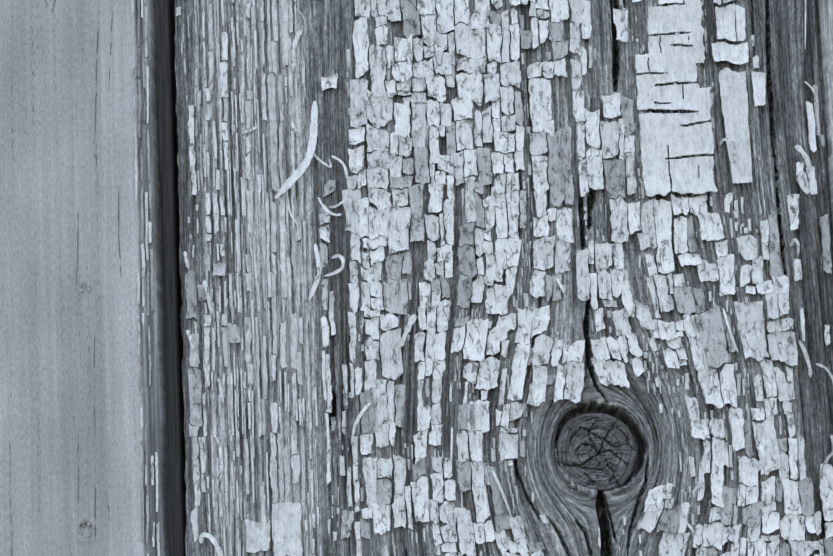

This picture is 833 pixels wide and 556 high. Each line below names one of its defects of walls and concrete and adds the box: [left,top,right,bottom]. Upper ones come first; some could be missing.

peeling [176,0,833,556]
crack [514,457,649,556]